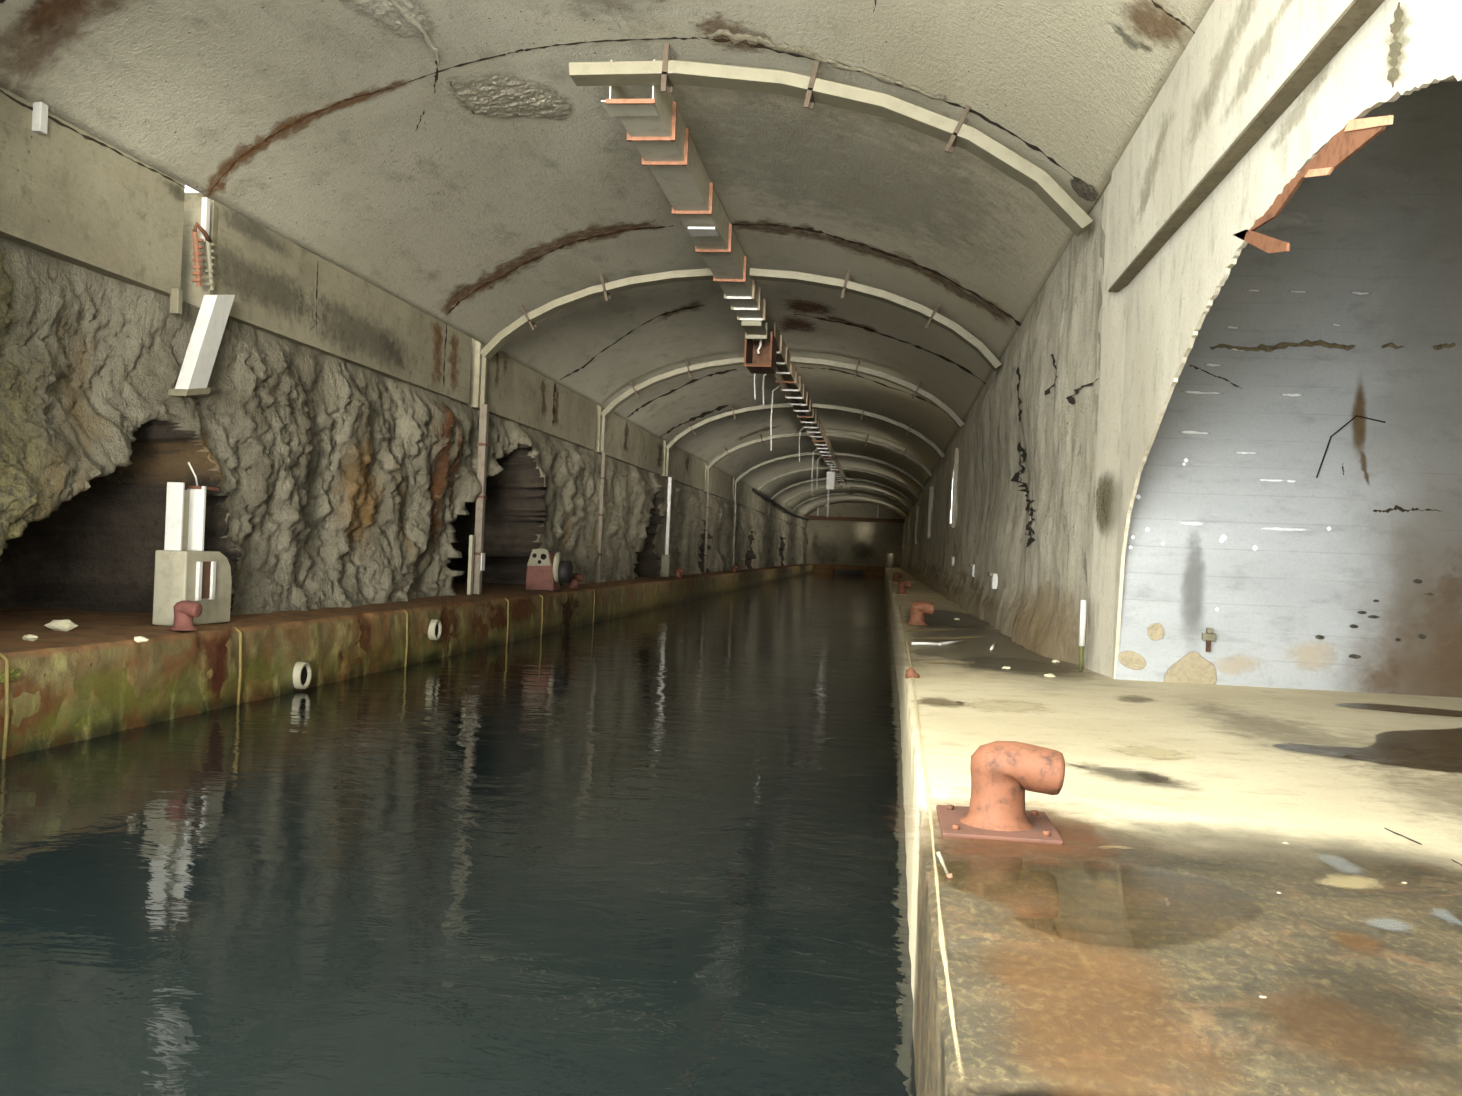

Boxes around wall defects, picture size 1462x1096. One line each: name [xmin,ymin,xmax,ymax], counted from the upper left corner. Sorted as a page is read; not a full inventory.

crack [265,37,860,140]
crack [0,89,223,194]
rust [208,81,404,195]
crack [895,84,1081,181]
rust [433,222,652,384]
spalling [1211,340,1355,352]
crack [1373,505,1439,513]
spalling [22,619,78,641]
rust [202,631,231,693]
rust [440,599,534,650]
peeling [1118,651,1146,670]
peeling [1164,652,1217,685]